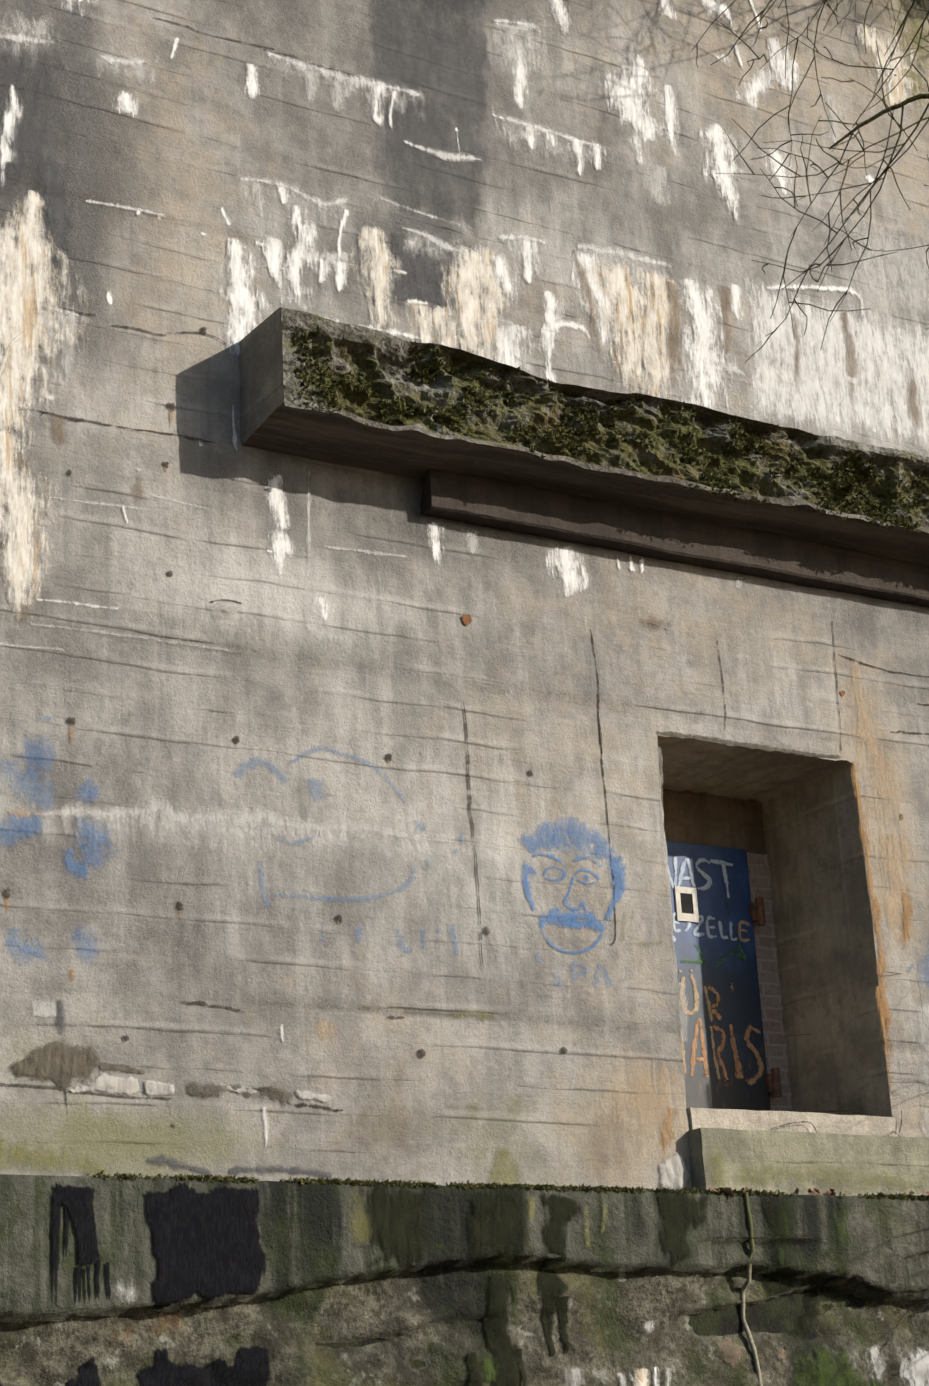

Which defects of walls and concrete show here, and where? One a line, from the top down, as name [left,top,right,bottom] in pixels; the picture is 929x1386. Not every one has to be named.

damp [220,0,929,444]
damp [0,22,164,611]
damp [81,629,229,651]
crack [717,640,726,728]
crack [832,622,929,751]
crack [463,702,483,963]
crack [590,630,616,945]
corrosion [852,761,913,1070]
damp [55,1182,99,1265]
damp [78,1357,101,1386]
efflorescence [618,1367,669,1386]
damp [900,1350,929,1386]